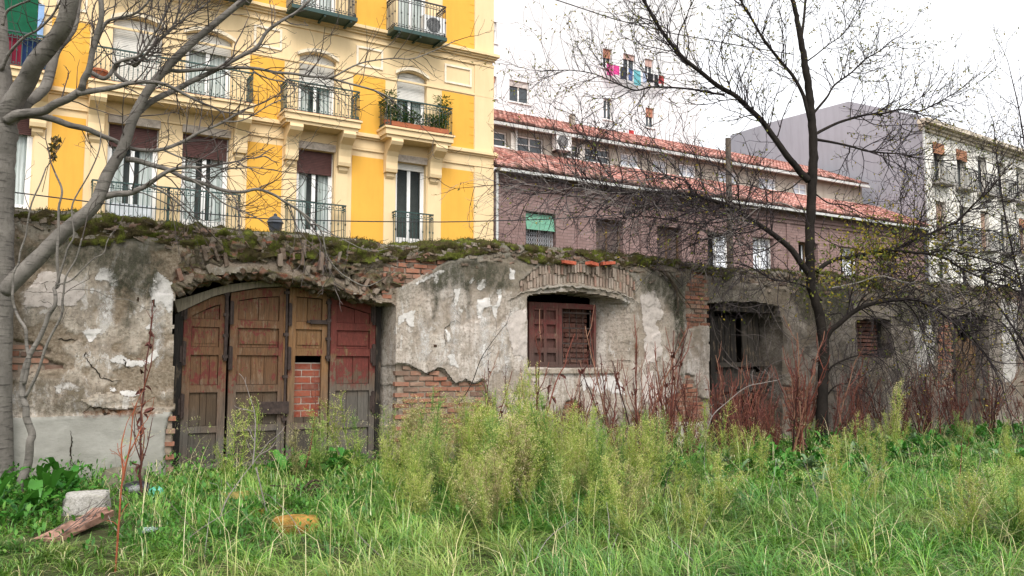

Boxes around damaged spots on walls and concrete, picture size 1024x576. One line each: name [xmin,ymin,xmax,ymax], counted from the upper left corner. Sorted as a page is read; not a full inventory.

peeling [23,267,119,310]
spalling [137,238,451,313]
flaking render [12,340,64,377]
crack [59,338,128,382]
peeling [109,349,159,367]
flaking render [453,264,710,422]
flaking render [392,329,496,444]